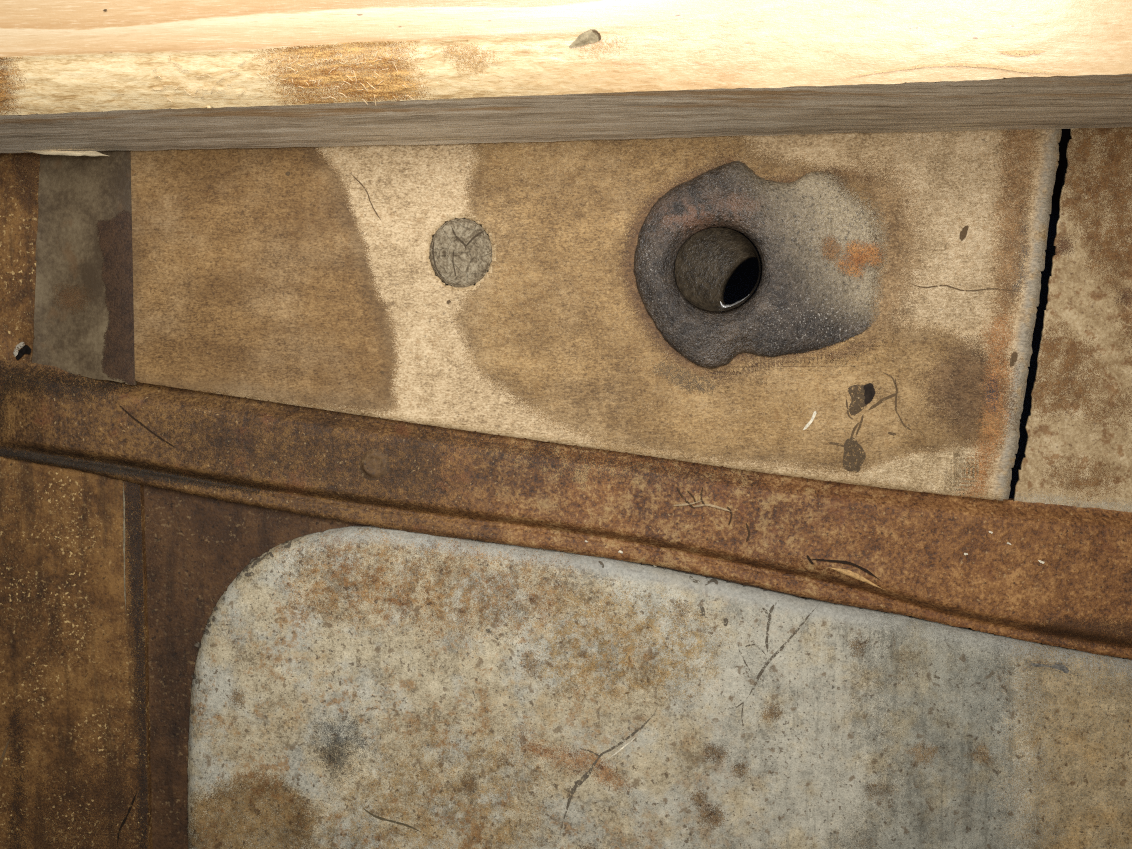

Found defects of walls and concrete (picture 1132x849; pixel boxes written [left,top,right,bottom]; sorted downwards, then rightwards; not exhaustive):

leakage [131,147,401,416]
leakage [450,135,1025,478]
corrosion [817,234,885,279]
crack [907,282,1017,292]
crack [1034,134,1071,382]